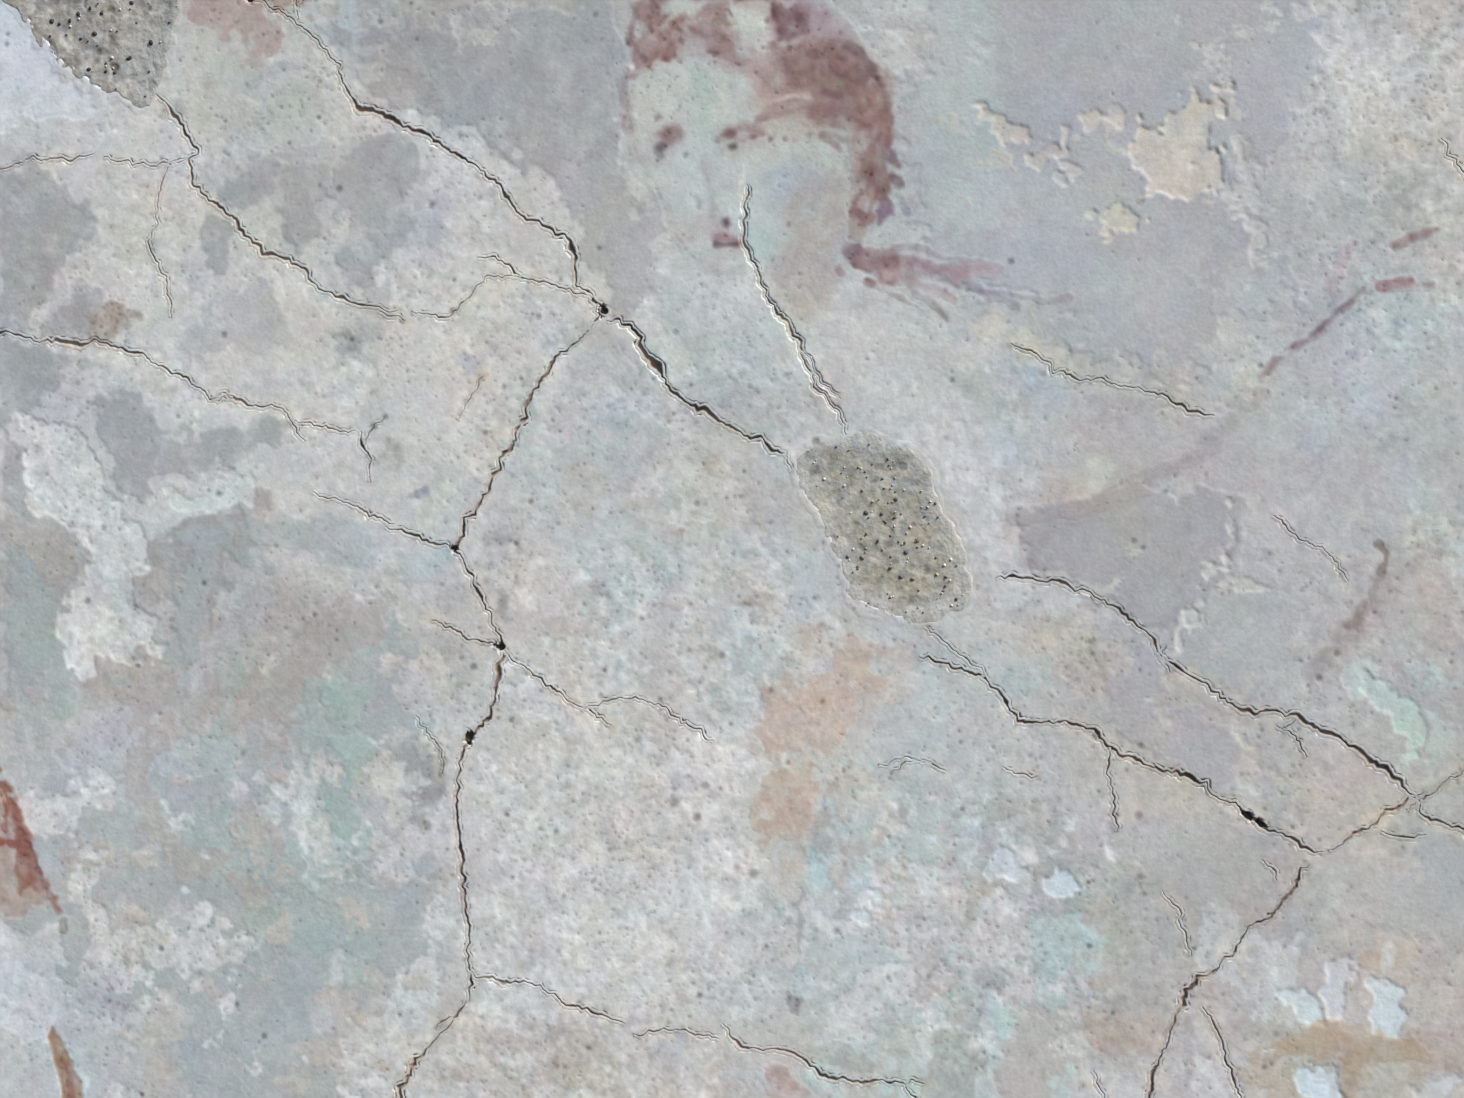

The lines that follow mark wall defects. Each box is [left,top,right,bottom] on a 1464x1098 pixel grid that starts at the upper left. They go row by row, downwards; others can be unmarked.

spalling [0,0,187,135]
crack [1438,137,1464,181]
crack [1010,341,1215,419]
crack [0,0,925,1098]
spalling [789,426,981,630]
crack [1271,514,1351,582]
crack [878,753,947,775]
rust [0,764,70,935]
crack [919,571,1464,1098]